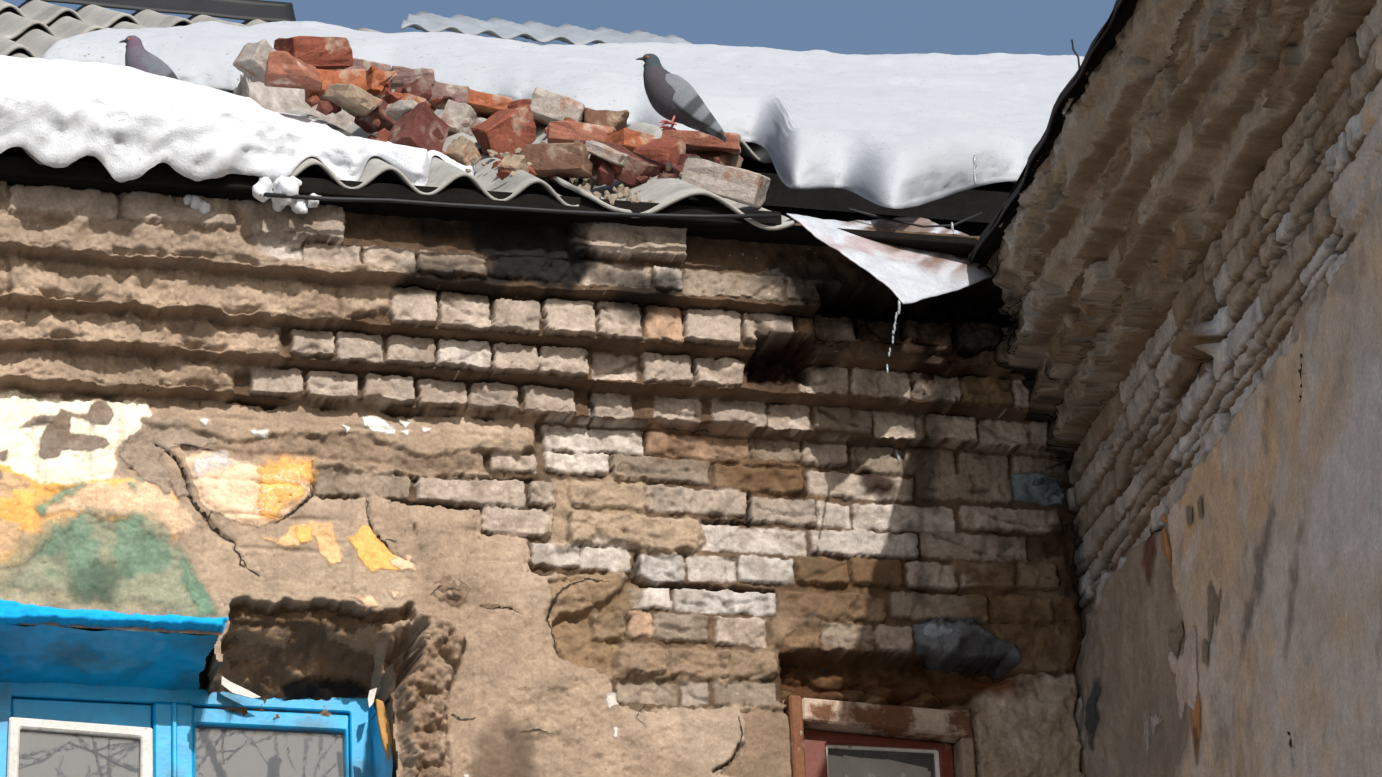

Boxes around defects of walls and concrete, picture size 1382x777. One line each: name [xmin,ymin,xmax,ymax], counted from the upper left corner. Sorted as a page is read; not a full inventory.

leakage [401,221,596,302]
leakage [606,272,676,321]
peeling [343,416,429,435]
crack [155,443,260,576]
peeling [20,401,415,572]
peeling [1011,472,1066,506]
peeling [1186,497,1203,525]
spalling [207,591,405,720]
peeling [913,617,1023,679]
peeling [1168,583,1221,719]
peeling [606,692,619,708]